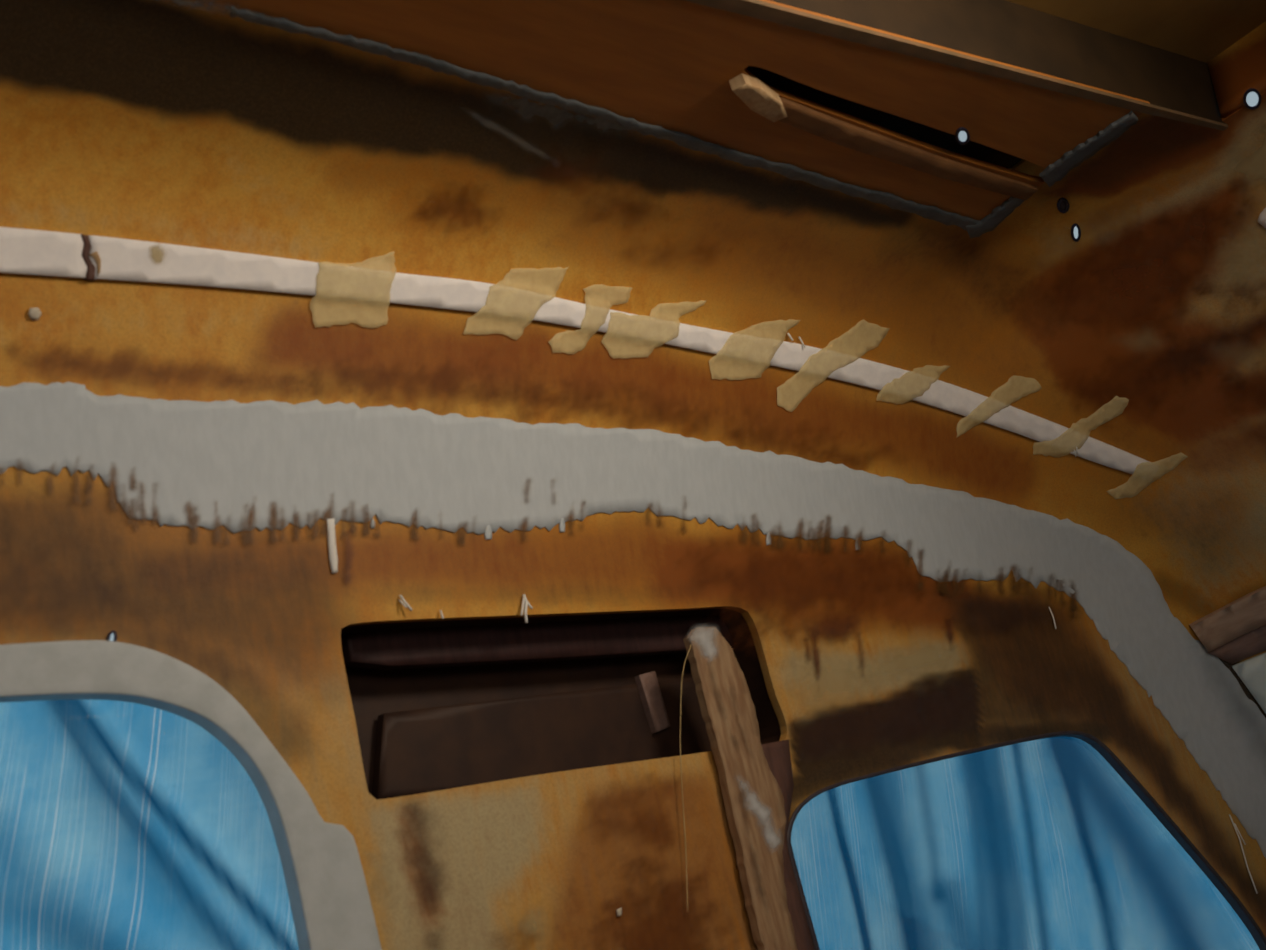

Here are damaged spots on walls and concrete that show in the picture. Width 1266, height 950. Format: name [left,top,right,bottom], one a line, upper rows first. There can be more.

crack [81,234,101,281]
peeling [694,628,716,658]